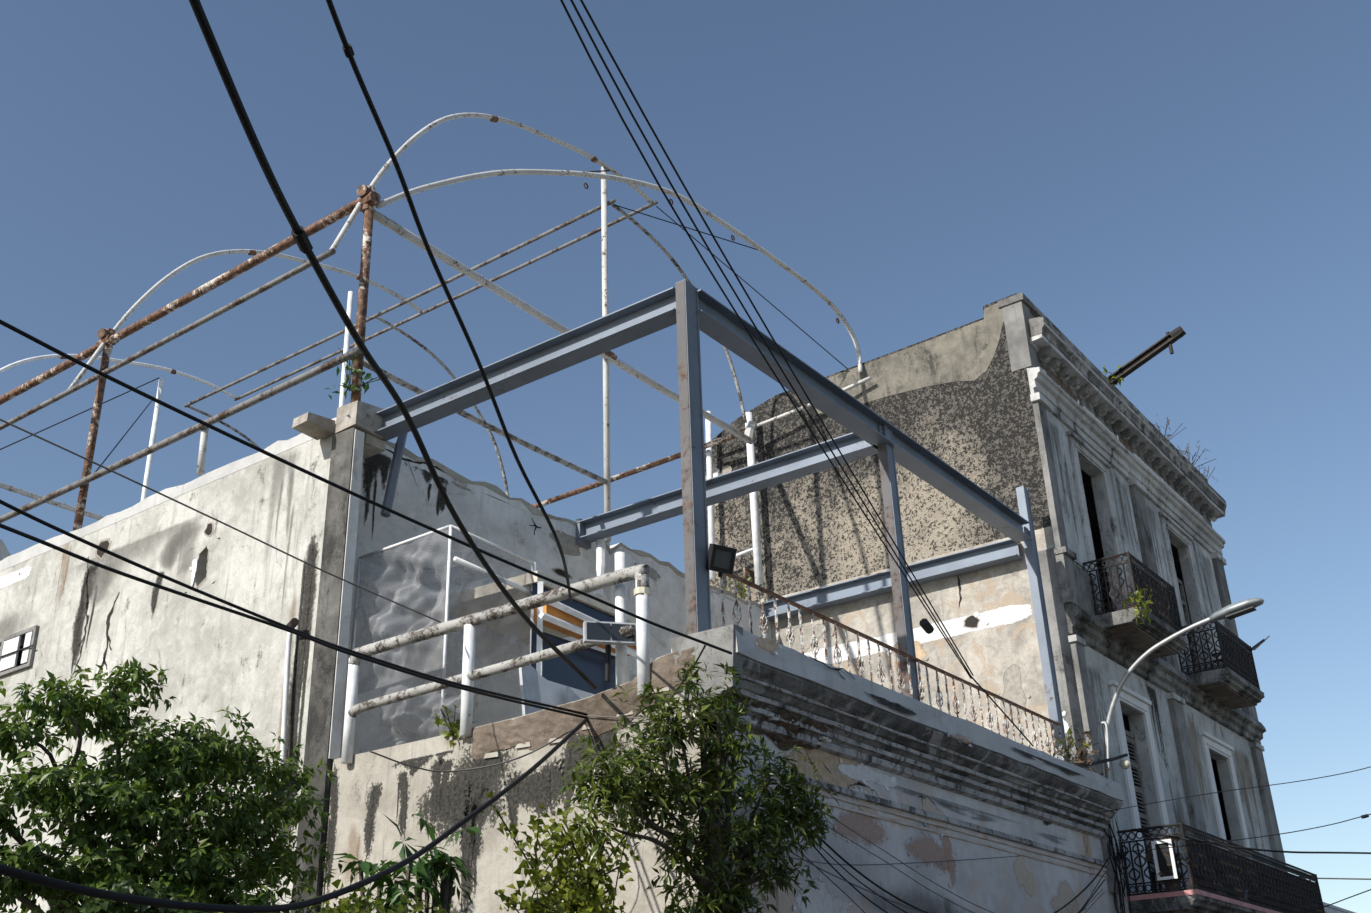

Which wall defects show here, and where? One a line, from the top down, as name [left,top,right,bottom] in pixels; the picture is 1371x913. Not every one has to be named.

leakage [71,538,146,672]
leakage [151,526,195,615]
peeling [775,736,898,854]
peeling [907,797,959,887]